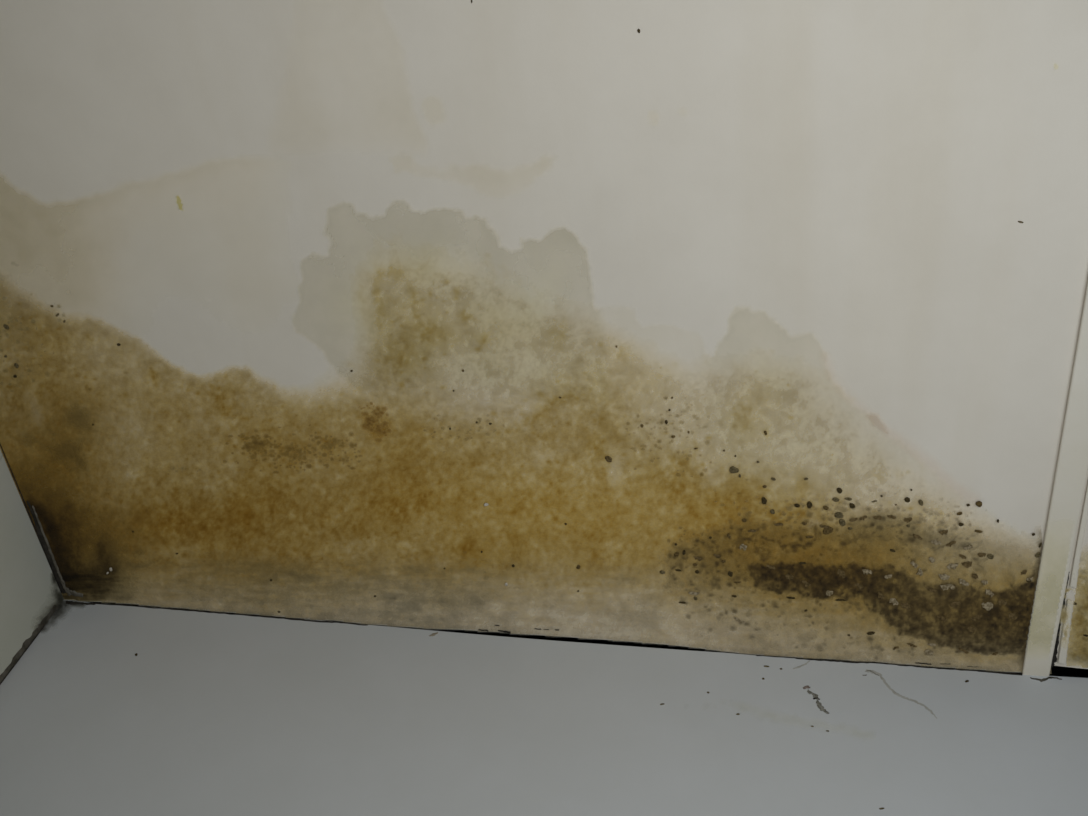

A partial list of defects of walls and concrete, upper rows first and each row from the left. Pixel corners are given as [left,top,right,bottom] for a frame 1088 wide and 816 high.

water stain [223,402,391,474]
water stain [626,397,712,476]
water stain [9,403,155,603]
water stain [176,563,493,629]
water stain [660,477,1043,671]
water stain [1066,556,1088,668]